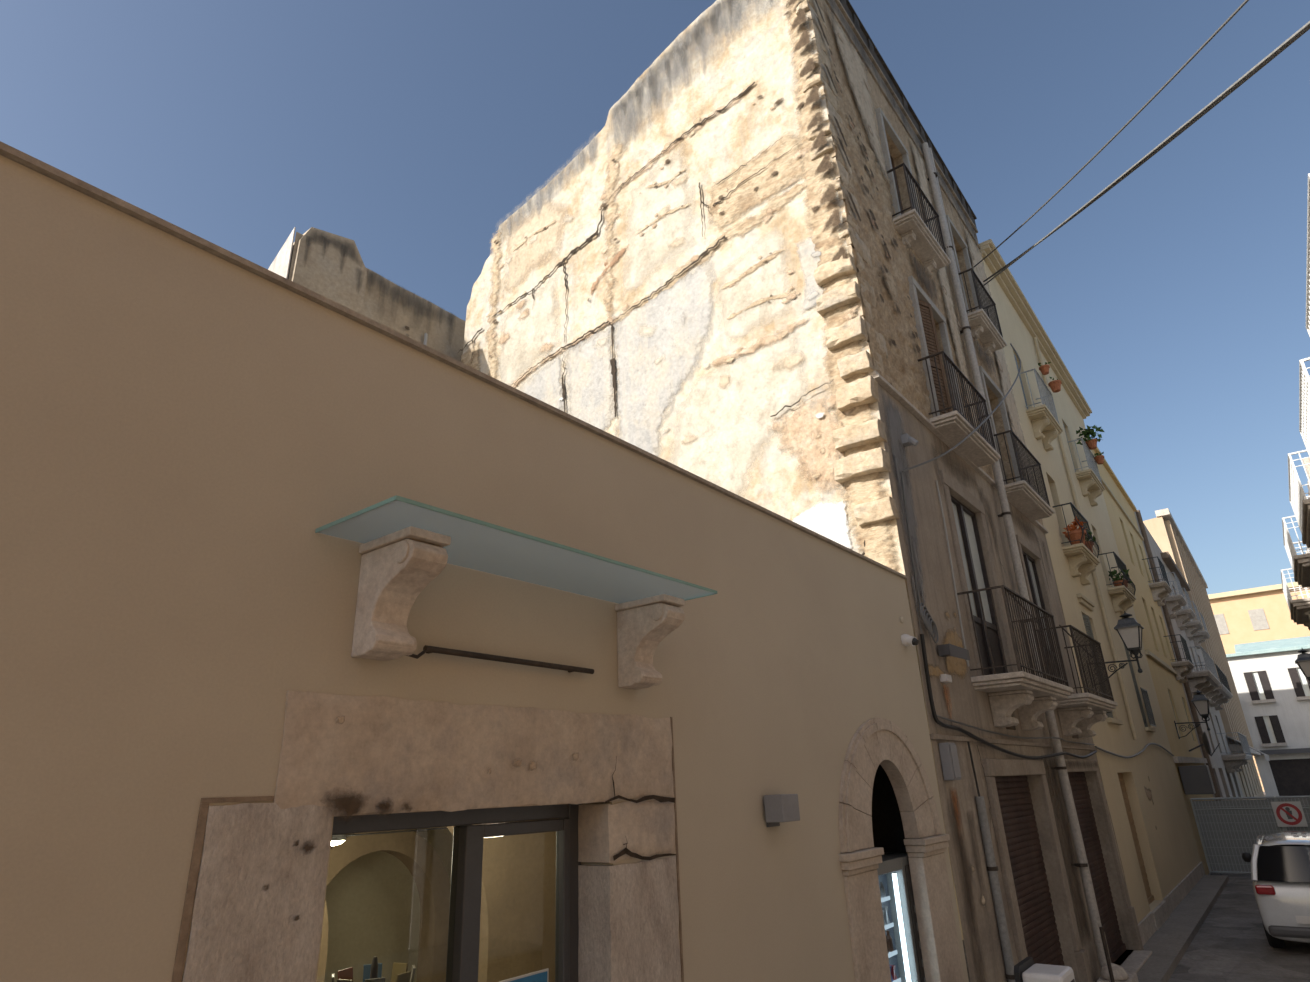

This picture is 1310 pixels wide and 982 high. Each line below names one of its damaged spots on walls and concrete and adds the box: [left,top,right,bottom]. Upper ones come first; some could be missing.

leakage [614,0,761,139]
crack [698,182,711,237]
spalling [511,0,920,388]
spalling [461,221,555,378]
crack [458,203,604,412]
crack [609,324,617,417]
spalling [711,302,897,570]
crack [605,756,675,803]
crack [613,836,676,861]